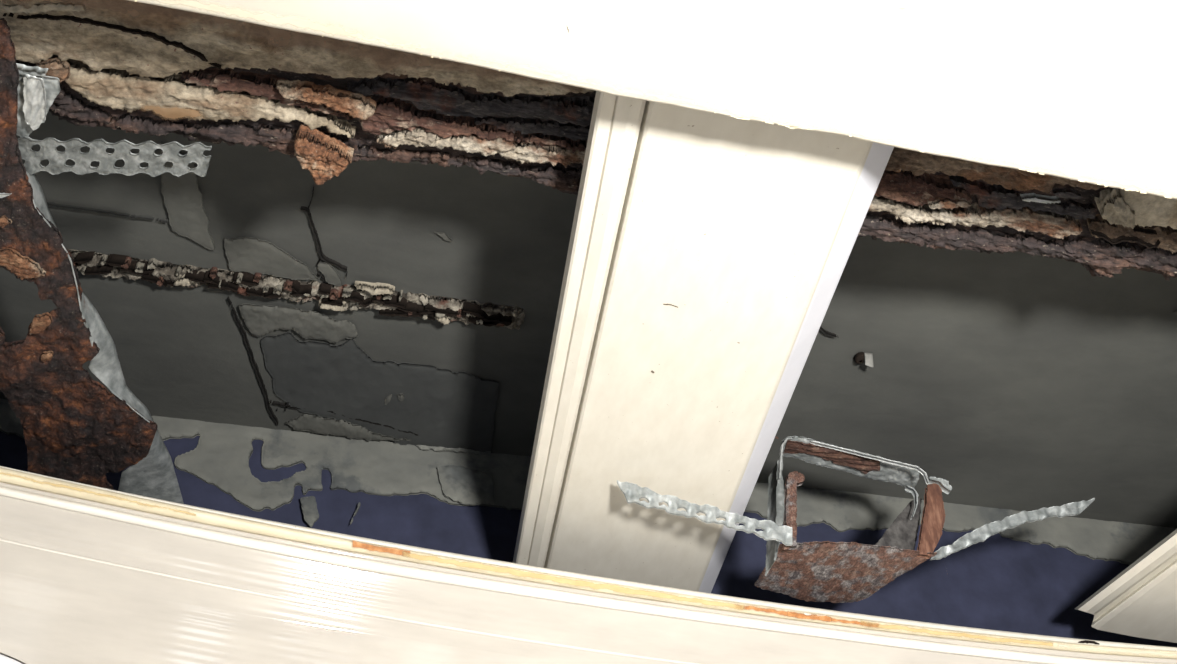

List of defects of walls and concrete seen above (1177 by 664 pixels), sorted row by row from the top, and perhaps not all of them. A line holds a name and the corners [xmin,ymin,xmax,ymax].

corrosion [0,0,595,192]
spalling [0,0,692,138]
spalling [706,105,994,159]
crack [300,183,347,285]
corrosion [857,147,1177,278]
spalling [1019,163,1177,254]
peeling [74,142,531,527]
crack [227,296,418,436]
corrosion [784,440,880,474]